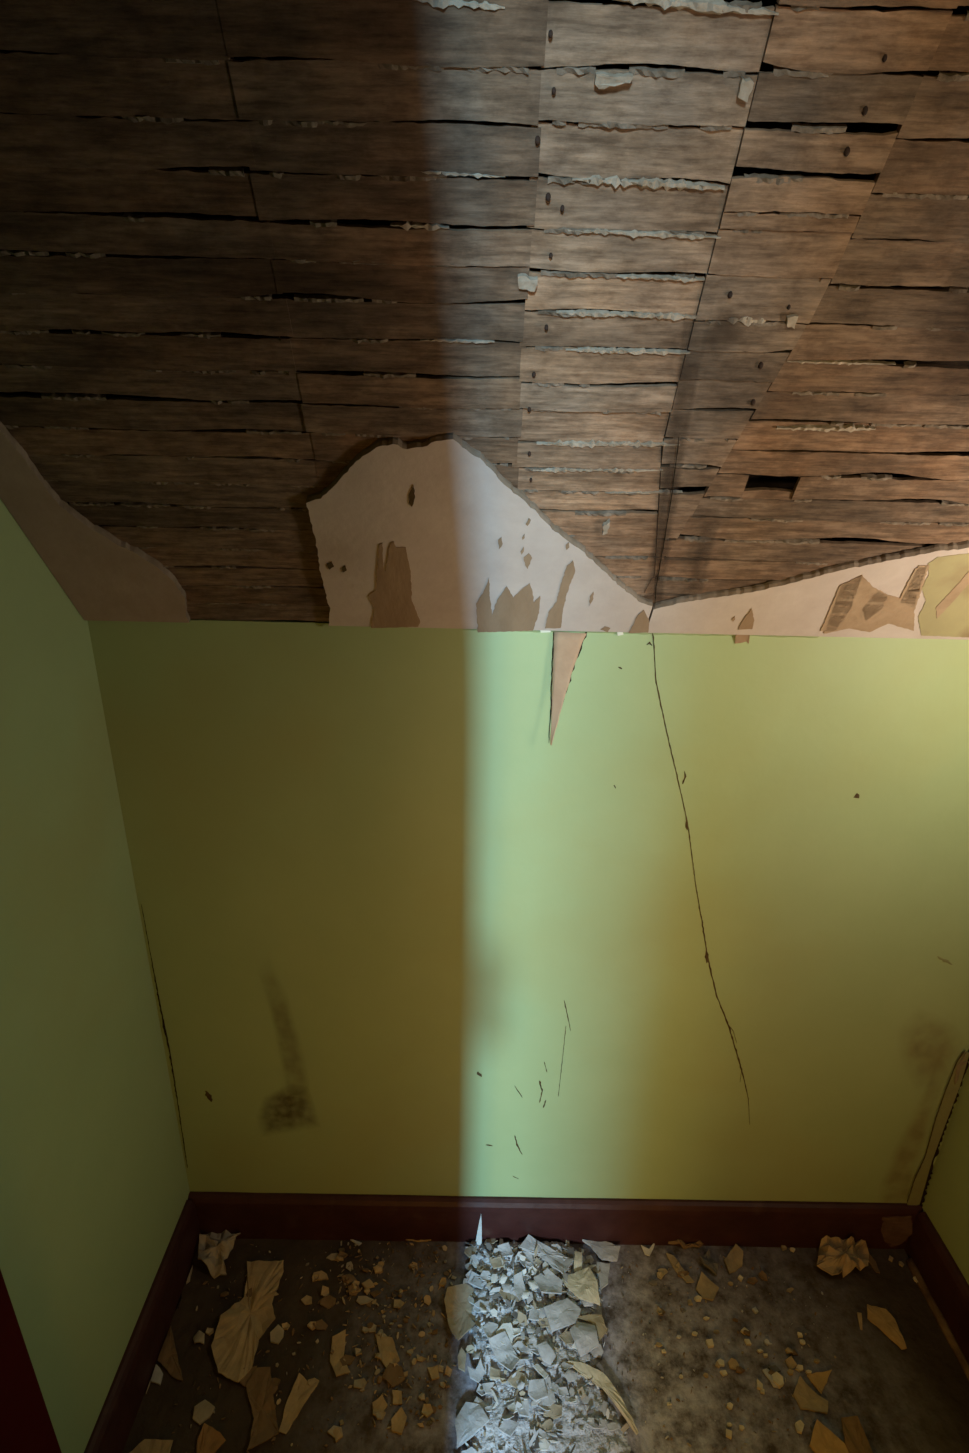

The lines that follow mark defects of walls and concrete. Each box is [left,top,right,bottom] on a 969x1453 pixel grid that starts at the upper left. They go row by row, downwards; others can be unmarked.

peeling [368,541,420,628]
peeling [476,518,649,746]
peeling [820,565,929,634]
crack [647,438,750,1123]
crack [907,1050,969,1207]